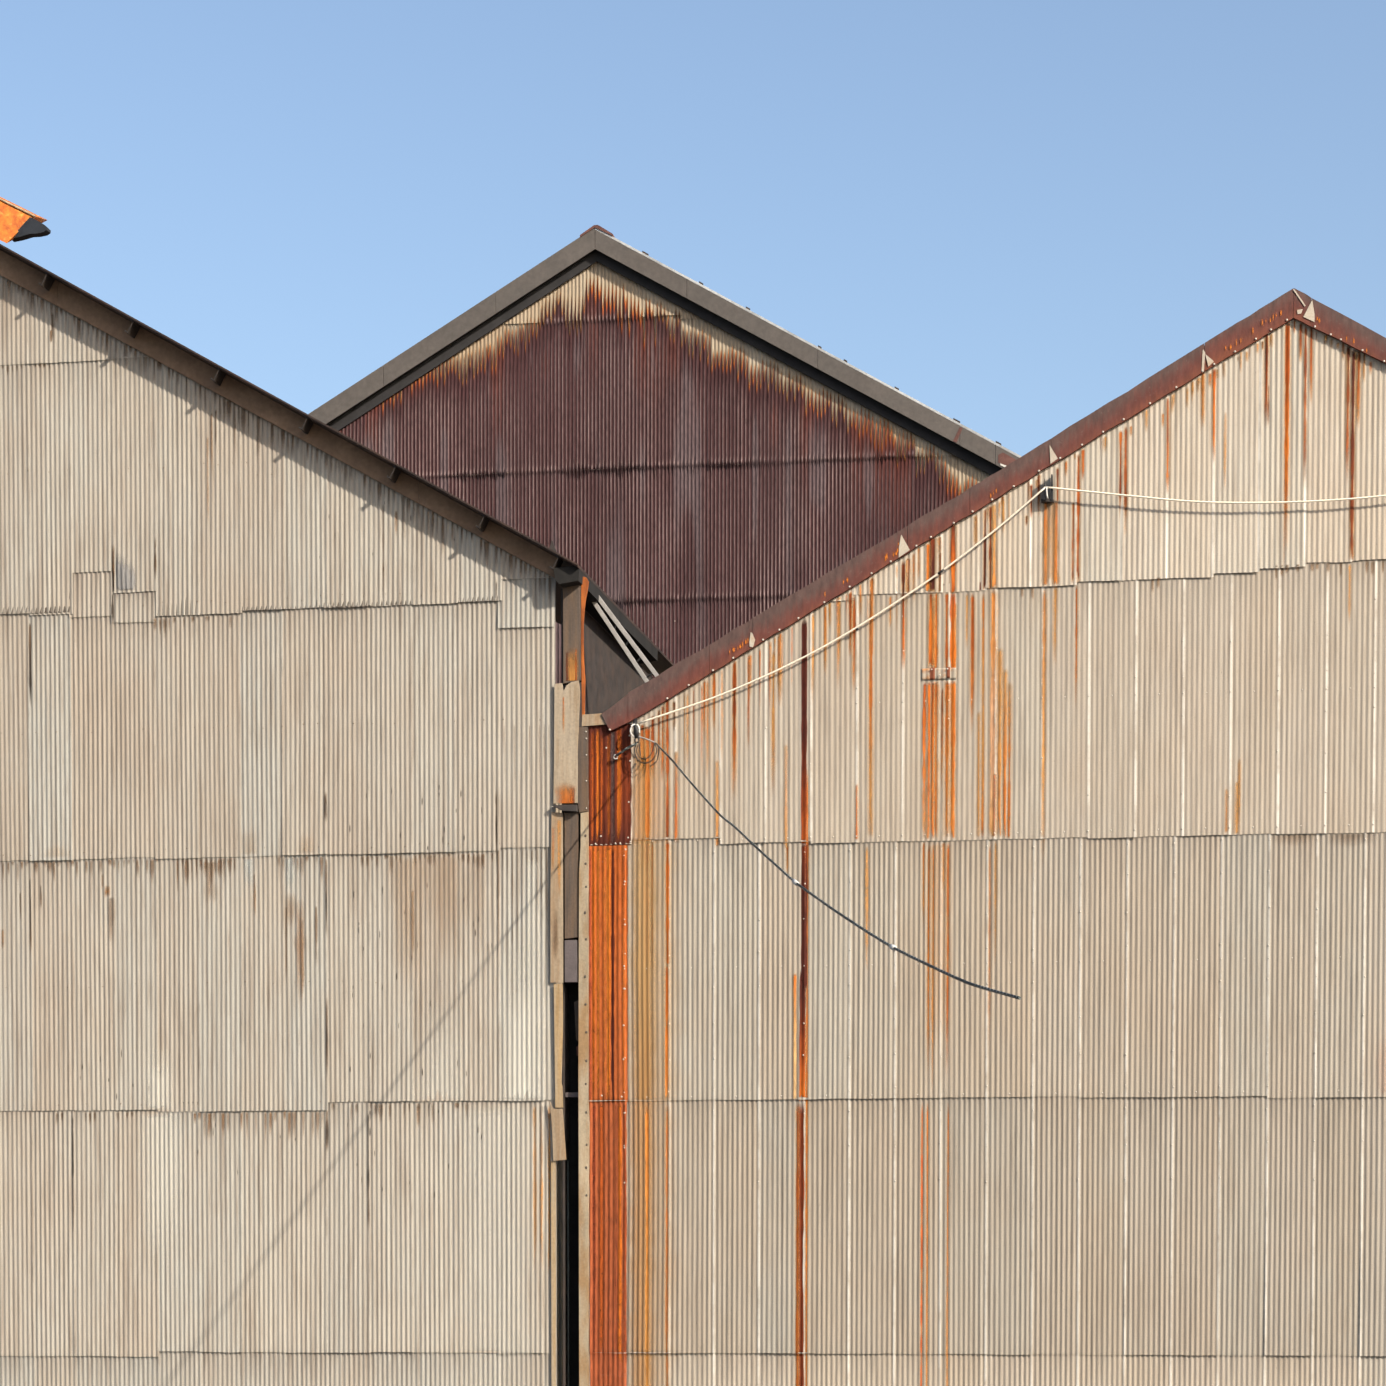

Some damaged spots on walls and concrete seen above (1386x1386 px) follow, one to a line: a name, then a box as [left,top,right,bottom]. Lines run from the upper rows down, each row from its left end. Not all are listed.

rust [998,453,1016,467]
rust [1105,311,1372,610]
rust [1026,450,1085,811]
rust [339,275,1011,1386]
rust [1225,762,1240,833]